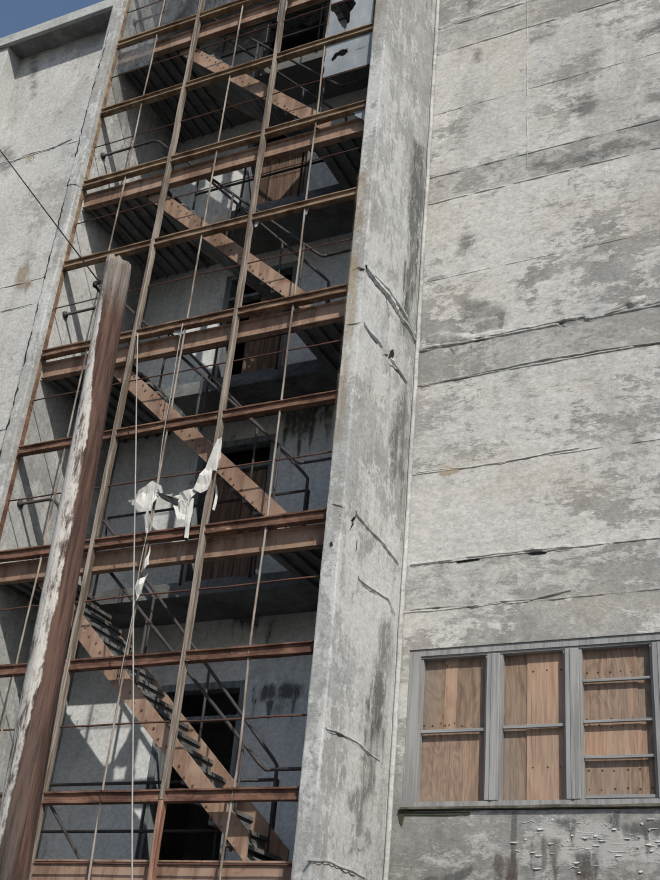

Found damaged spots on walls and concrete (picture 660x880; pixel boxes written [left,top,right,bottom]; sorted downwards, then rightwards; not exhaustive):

crack [0,28,110,457]
crack [347,264,660,387]
crack [333,504,573,568]
crack [358,576,570,616]
damp [252,684,301,716]
damp [365,623,391,745]
damp [349,756,374,839]
damp [542,839,558,878]
damp [577,855,598,877]
damp [609,811,660,849]